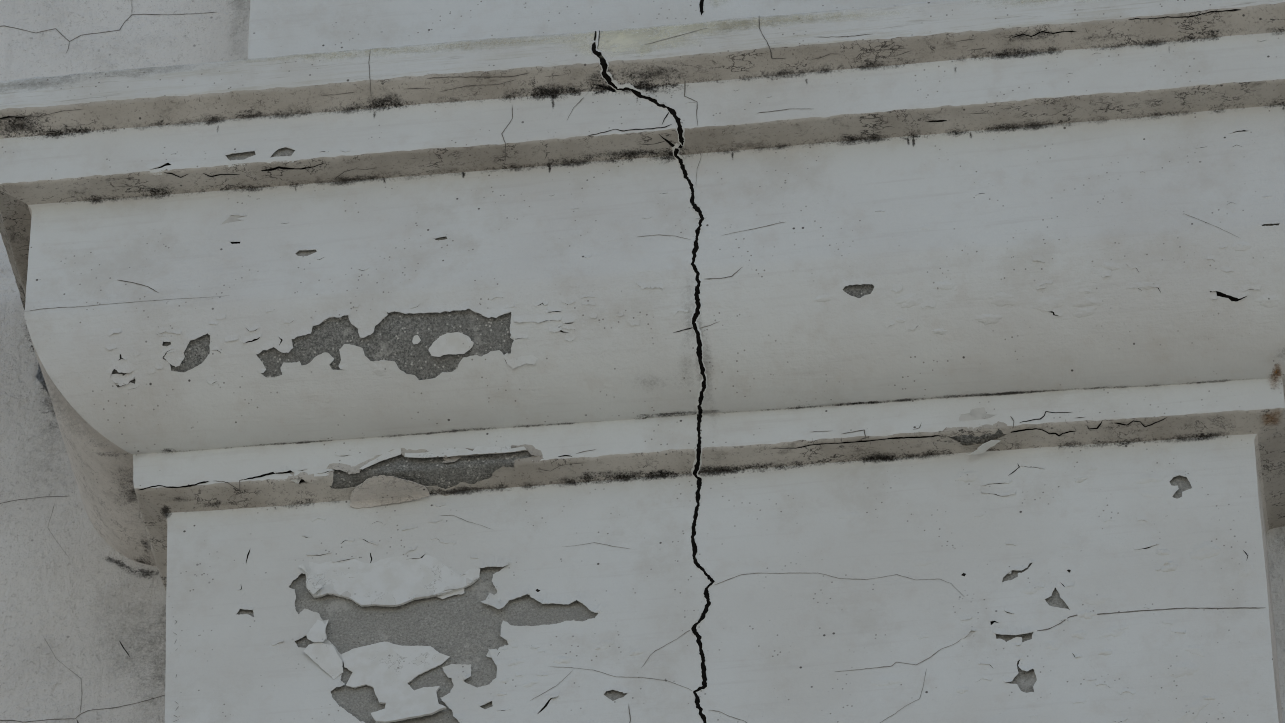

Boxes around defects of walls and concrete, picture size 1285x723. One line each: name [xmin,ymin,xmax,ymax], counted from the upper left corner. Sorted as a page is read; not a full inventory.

crack [698,0,706,17]
water stain [372,95,401,117]
water stain [532,70,614,107]
water stain [2,118,80,136]
water stain [590,150,674,160]
peeling [155,325,223,380]
peeling [239,298,581,387]
crack [530,30,783,723]
crack [774,425,940,449]
peeling [269,444,543,496]
peeling [271,535,608,723]
crack [1037,607,1257,631]